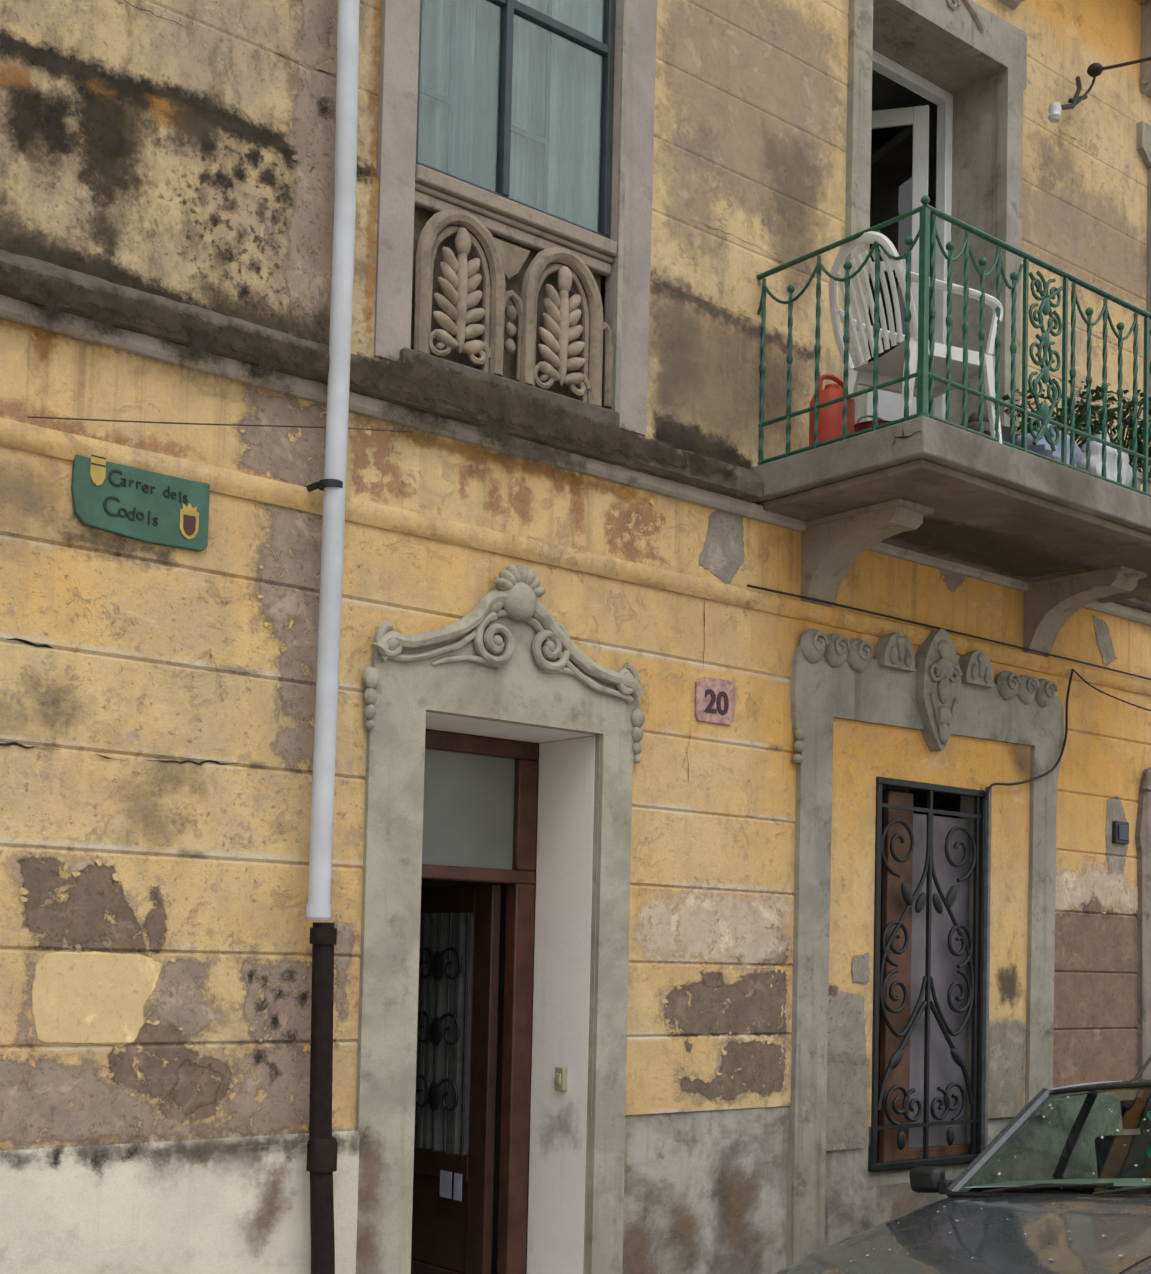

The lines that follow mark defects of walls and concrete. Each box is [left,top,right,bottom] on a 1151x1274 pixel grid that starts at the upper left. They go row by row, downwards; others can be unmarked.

damp [0,31,329,345]
damp [356,159,378,181]
peeling [352,416,408,500]
crack [6,638,52,648]
crack [0,742,61,750]
crack [97,754,239,765]
peeling [0,849,312,1150]
peeling [333,920,359,1021]
peeling [634,887,790,1105]
spalling [1053,796,1138,1088]
damp [51,1133,309,1169]
damp [623,1220,658,1274]